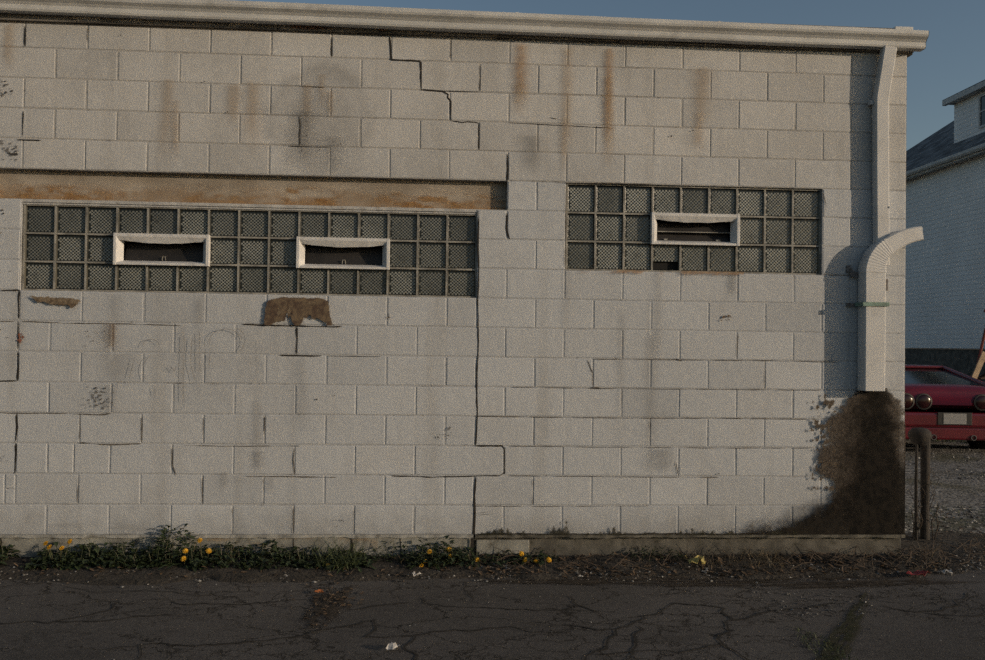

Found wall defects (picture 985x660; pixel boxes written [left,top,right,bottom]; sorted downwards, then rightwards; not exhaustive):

crack [389,37,481,150]
peeling [30,296,80,308]
peeling [264,297,332,326]
crack [719,339,774,361]
crack [393,217,611,555]
crack [587,359,683,389]
crack [702,385,763,393]
crack [247,448,336,487]
crack [621,423,698,474]
leakage [747,388,906,534]